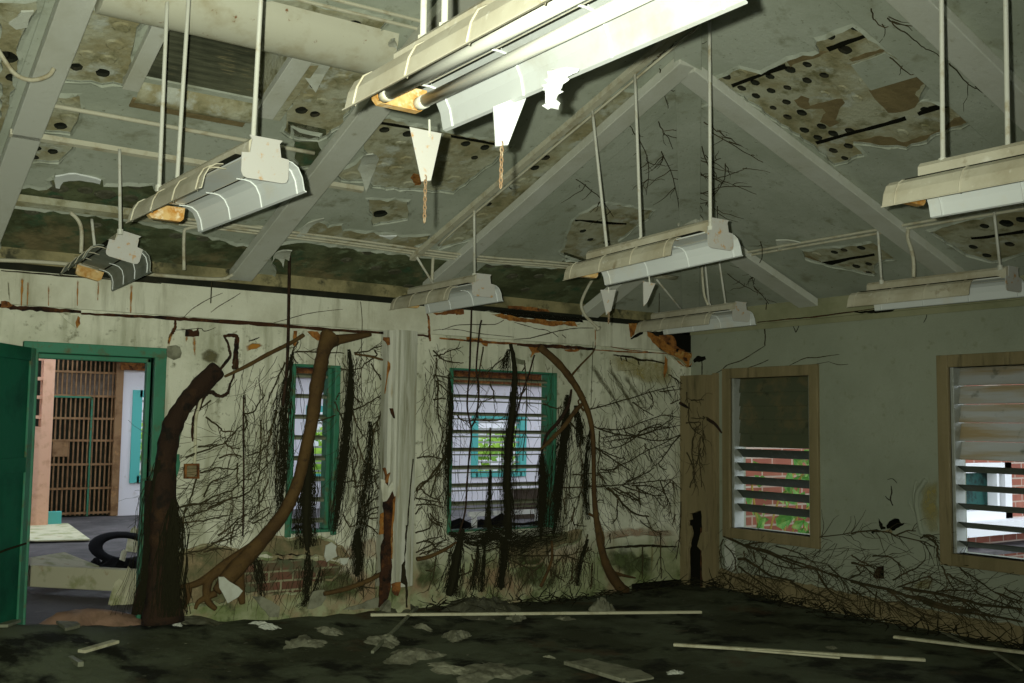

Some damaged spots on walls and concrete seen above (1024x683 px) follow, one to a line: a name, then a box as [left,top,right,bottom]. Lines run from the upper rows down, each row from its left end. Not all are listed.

spalling [629,323,706,367]
spalling [378,467,401,607]